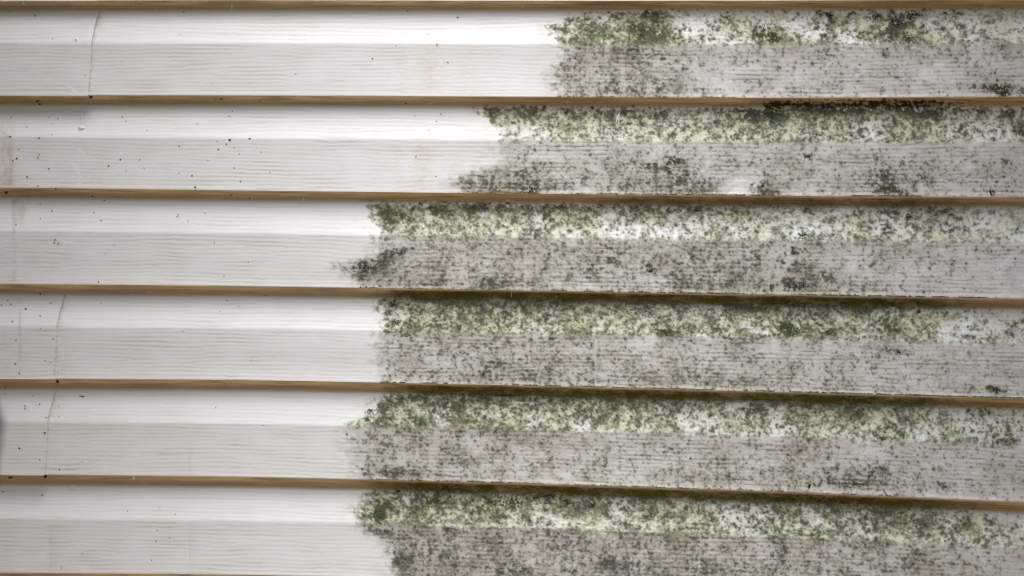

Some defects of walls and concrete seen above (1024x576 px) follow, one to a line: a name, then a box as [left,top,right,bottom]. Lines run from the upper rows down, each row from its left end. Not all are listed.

damp [341,8,1024,576]